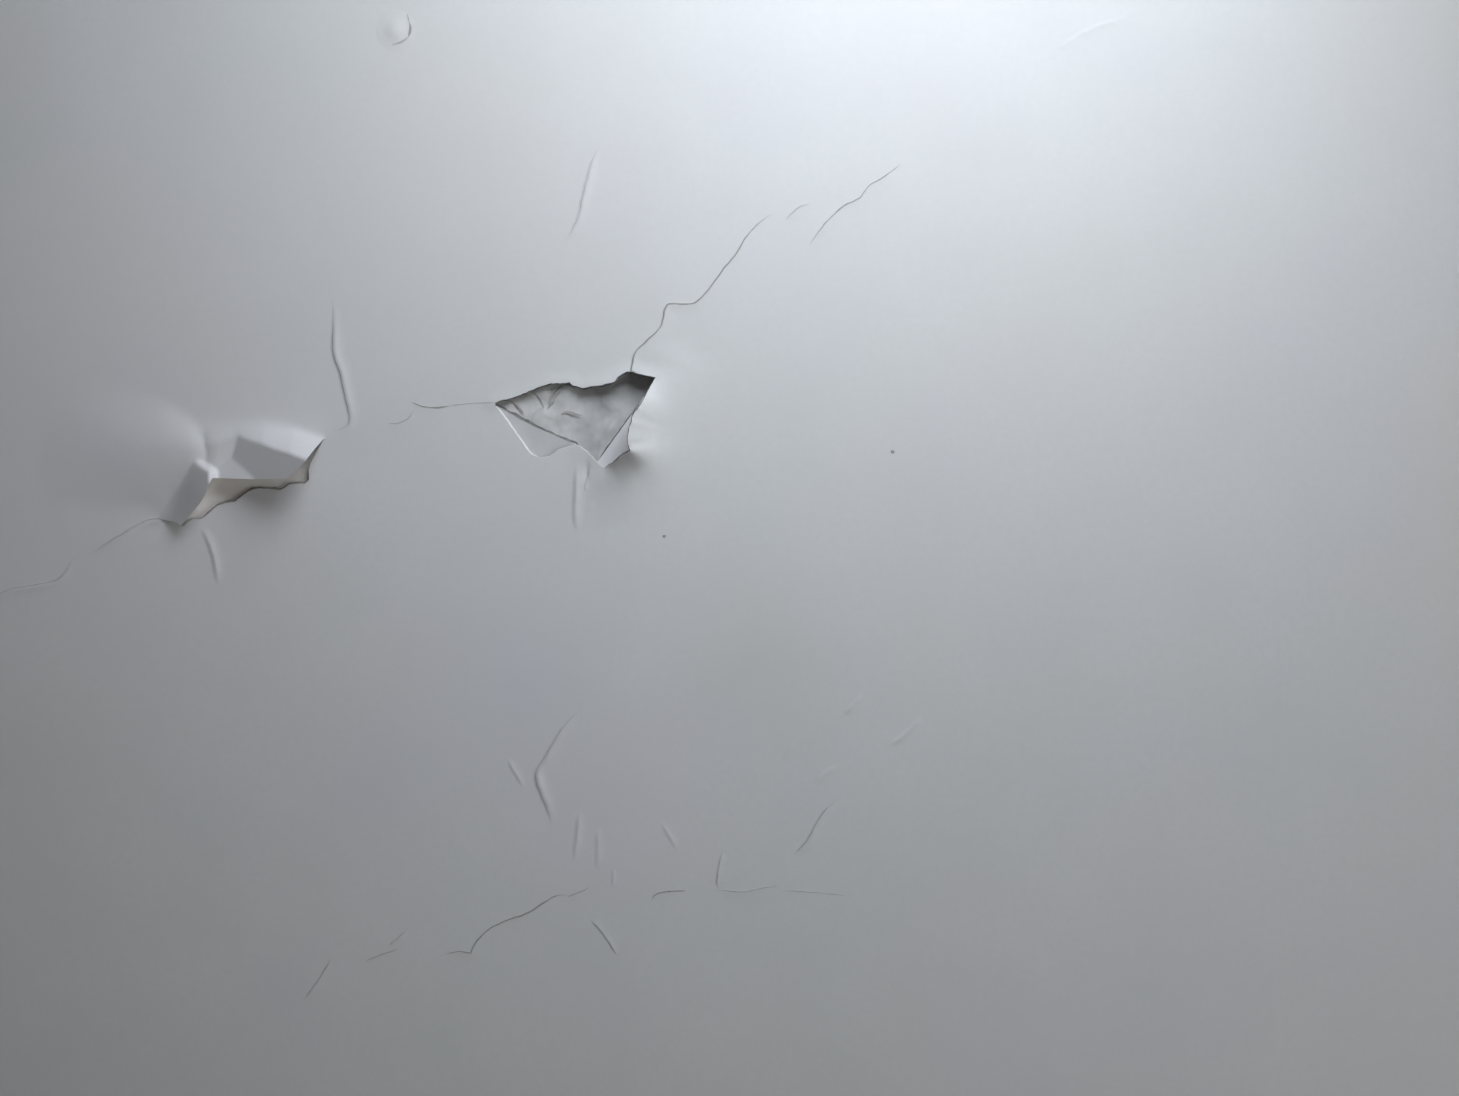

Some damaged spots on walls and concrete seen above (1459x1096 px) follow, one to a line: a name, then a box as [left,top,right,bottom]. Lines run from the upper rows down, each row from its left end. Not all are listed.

crack [568,151,601,240]
crack [629,164,901,373]
crack [327,304,361,438]
peeling [8,320,768,595]
crack [532,711,581,827]